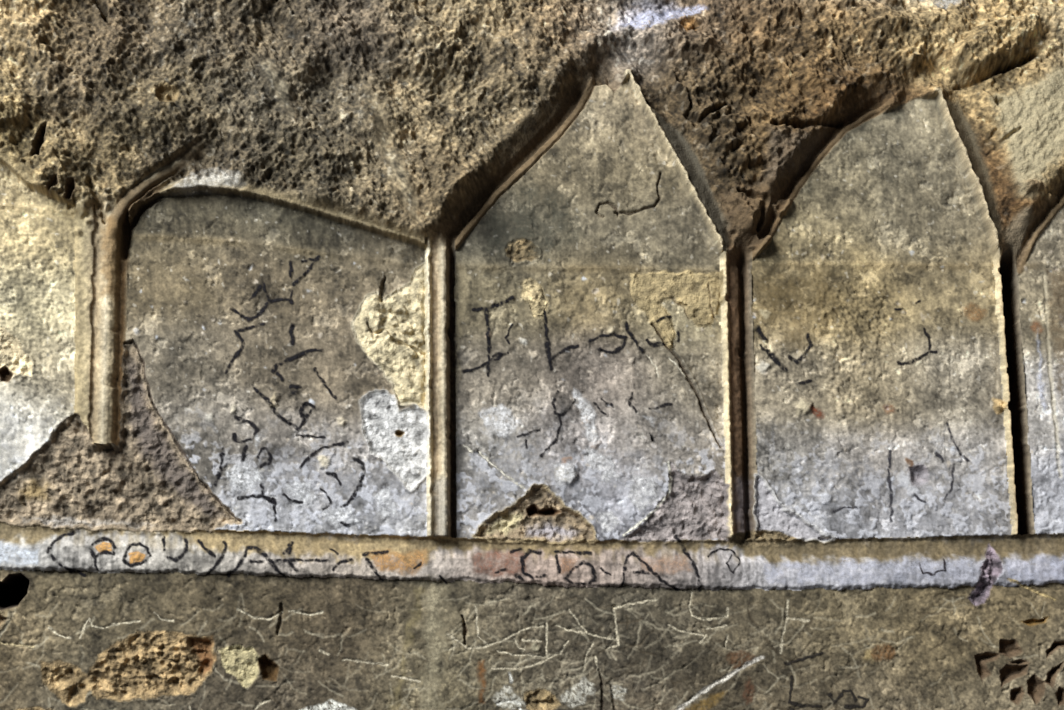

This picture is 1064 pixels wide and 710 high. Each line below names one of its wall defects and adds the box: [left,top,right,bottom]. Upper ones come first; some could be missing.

spalling [584,0,718,43]
water stain [629,7,704,28]
spalling [152,81,182,104]
spalling [29,120,50,158]
spalling [45,170,78,208]
spalling [351,257,431,492]
spalling [0,338,245,535]
spalling [473,484,598,545]
spalling [11,629,282,710]